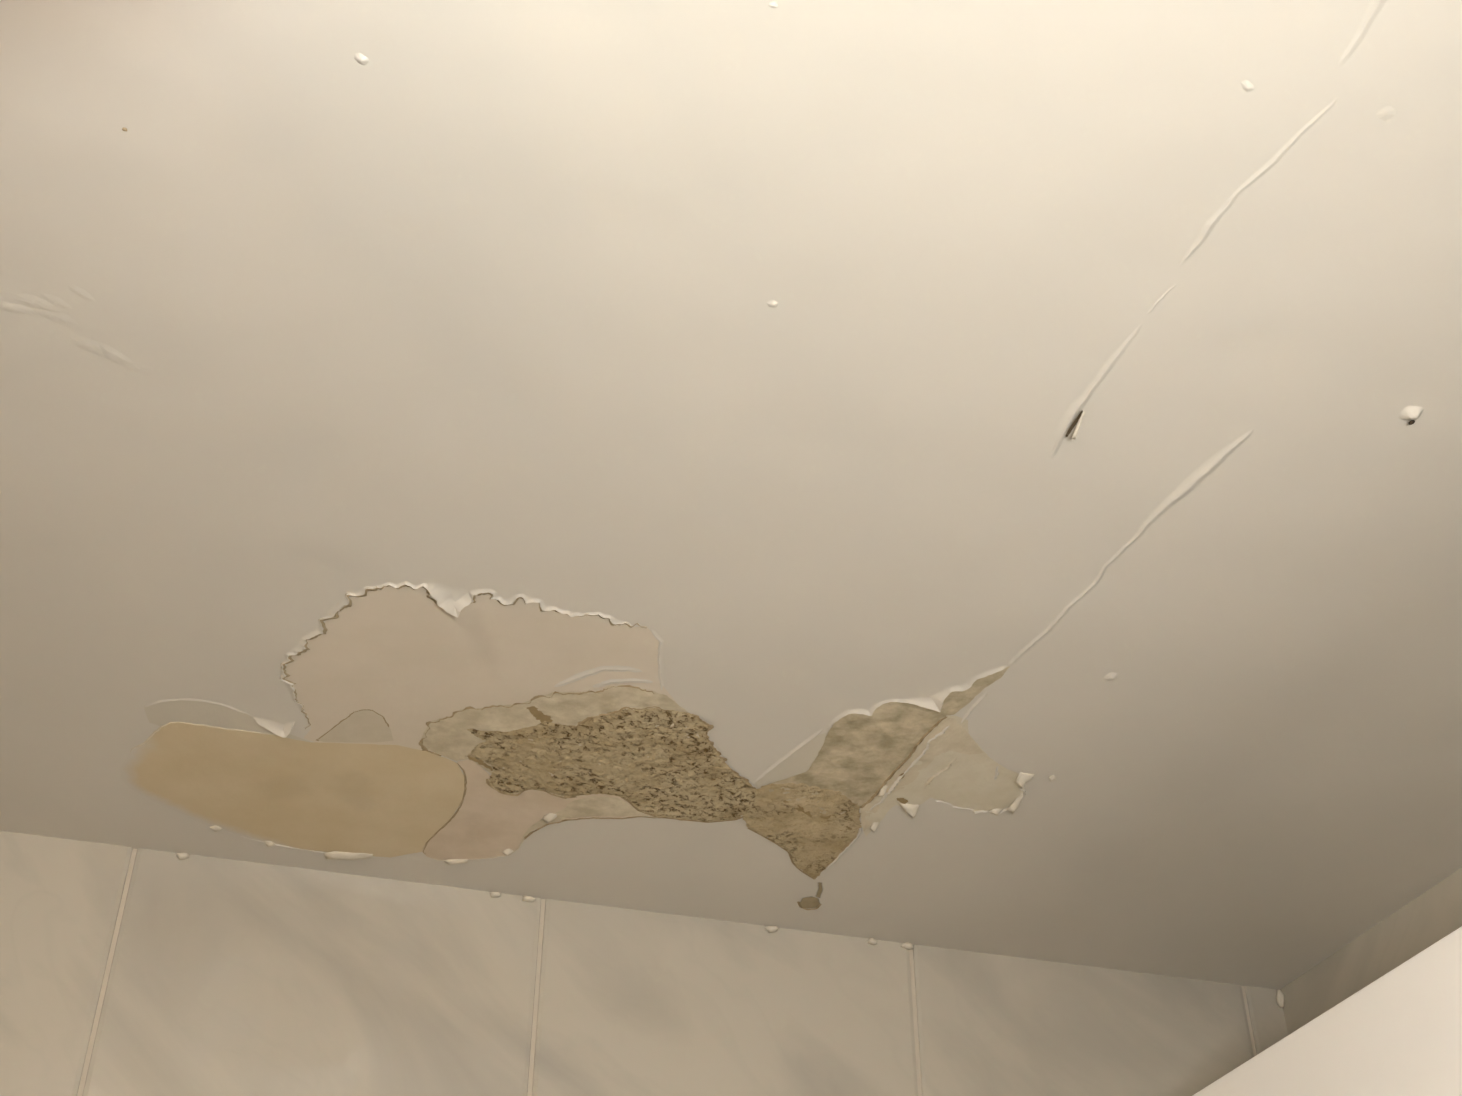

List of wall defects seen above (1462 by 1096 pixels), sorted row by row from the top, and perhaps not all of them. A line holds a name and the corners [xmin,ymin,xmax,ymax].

crack [1050,0,1387,459]
crack [1008,429,1254,665]
damp [120,698,464,860]
peeling [280,581,1010,879]